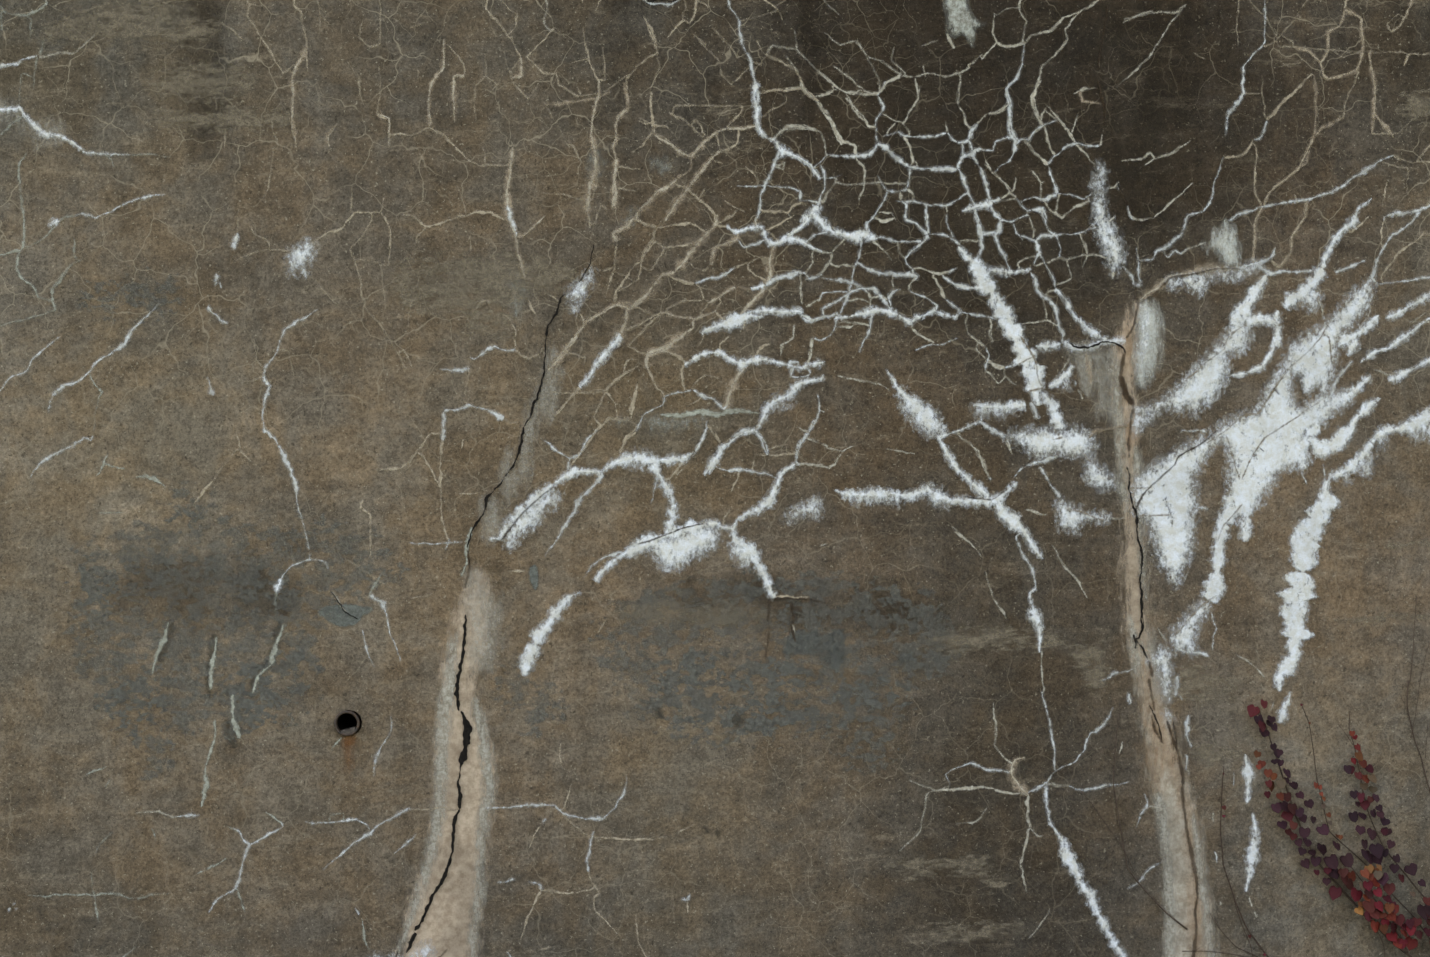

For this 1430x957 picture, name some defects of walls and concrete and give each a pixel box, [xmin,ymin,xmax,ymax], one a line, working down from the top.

efflorescence [946,0,980,48]
damp [572,270,591,313]
efflorescence [1092,163,1125,277]
efflorescence [1212,223,1237,263]
efflorescence [879,372,946,437]
crack [312,0,1430,957]
efflorescence [958,247,1379,724]
efflorescence [1242,756,1260,906]